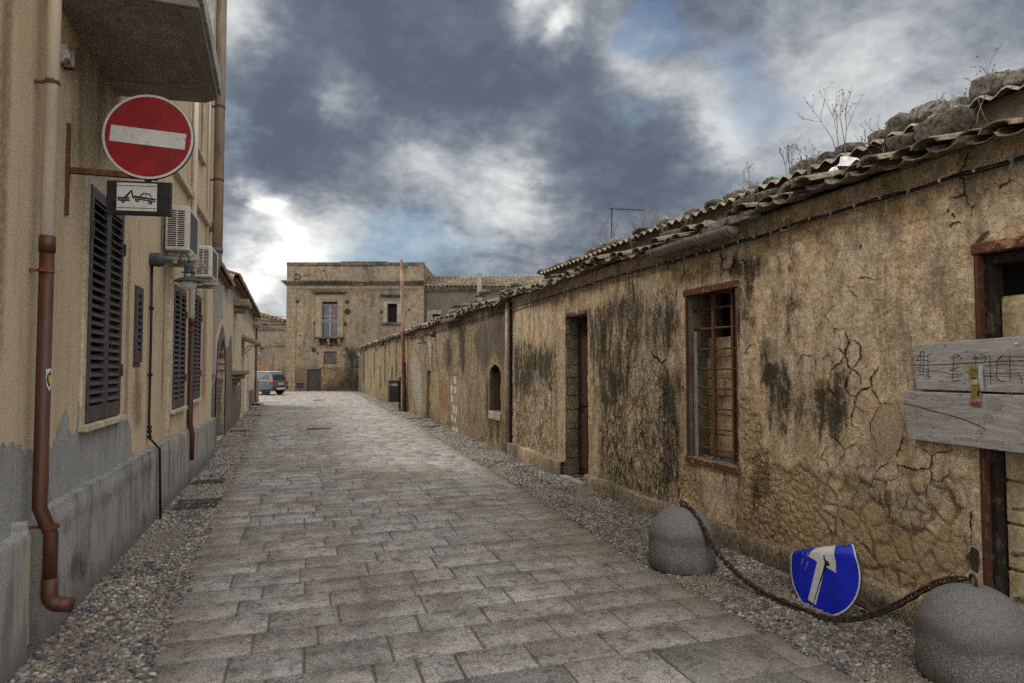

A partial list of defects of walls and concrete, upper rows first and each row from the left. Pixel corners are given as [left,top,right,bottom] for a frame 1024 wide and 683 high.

crack [944,153,976,226]
damp [443,316,552,441]
damp [588,278,681,416]
damp [659,369,681,481]
damp [759,340,849,444]
crack [797,276,953,484]